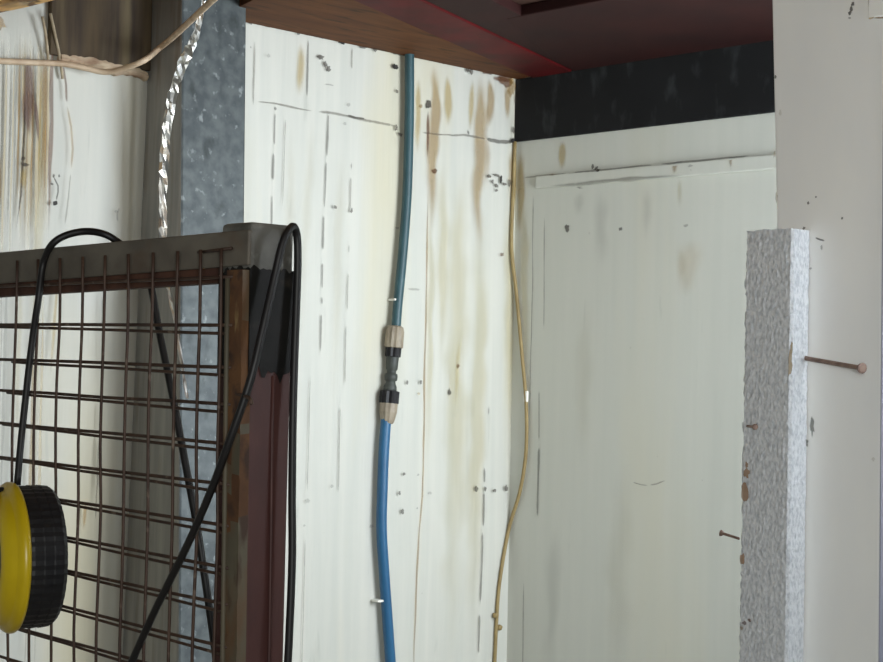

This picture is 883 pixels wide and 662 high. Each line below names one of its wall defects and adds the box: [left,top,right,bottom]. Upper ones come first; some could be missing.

corrosion [18,55,53,225]
corrosion [495,76,513,87]